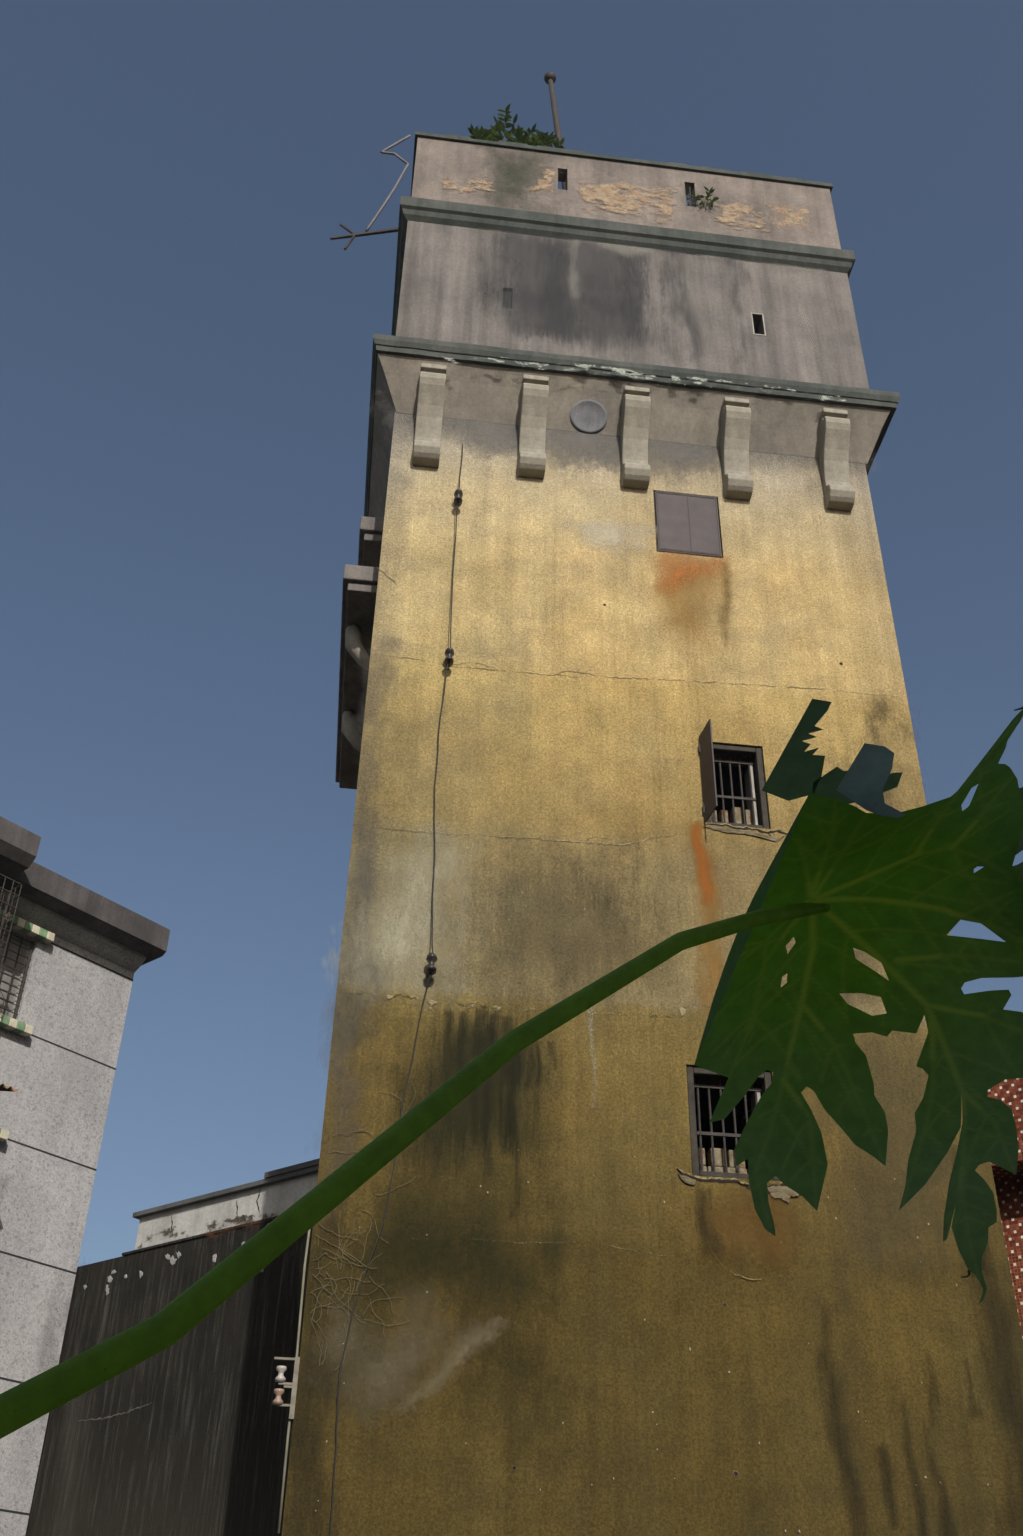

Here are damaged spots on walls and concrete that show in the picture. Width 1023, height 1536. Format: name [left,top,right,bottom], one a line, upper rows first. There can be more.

water stain [487,233,642,341]
water stain [426,1048,528,1156]
spalling [767,1185,799,1205]